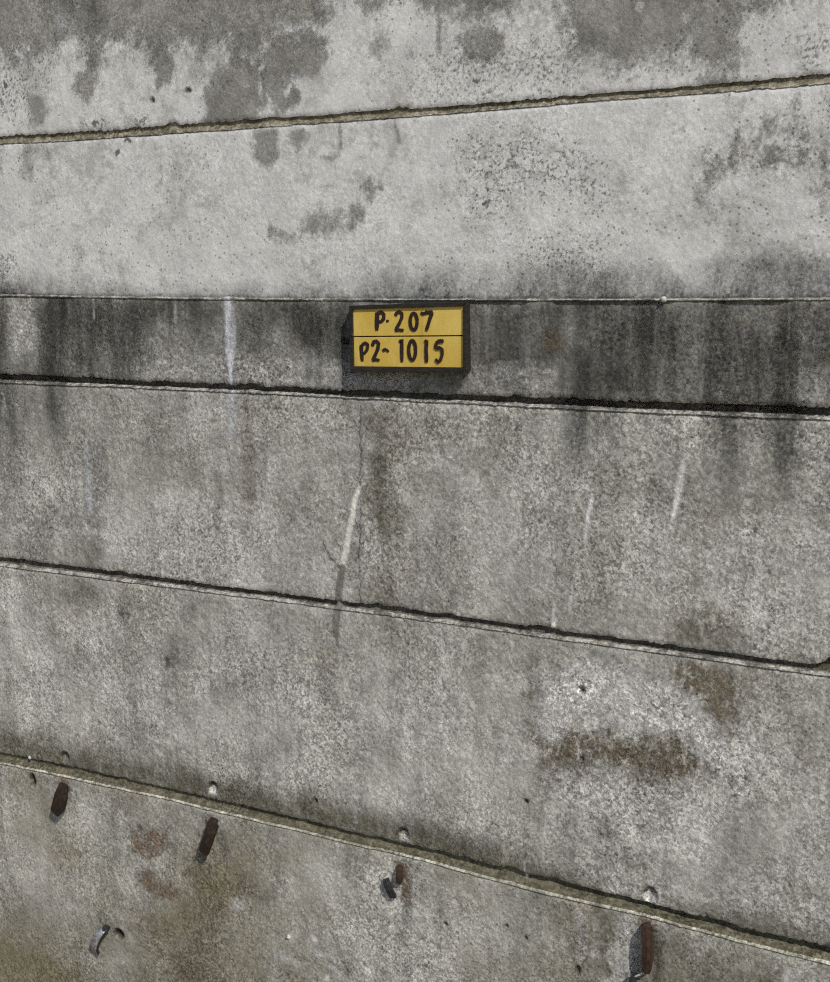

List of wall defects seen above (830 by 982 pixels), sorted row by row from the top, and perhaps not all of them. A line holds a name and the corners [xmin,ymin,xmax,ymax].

leakage [41,298,99,420]
leakage [193,296,236,440]
leakage [576,316,628,447]
crack [323,406,362,602]
leakage [536,731,707,799]